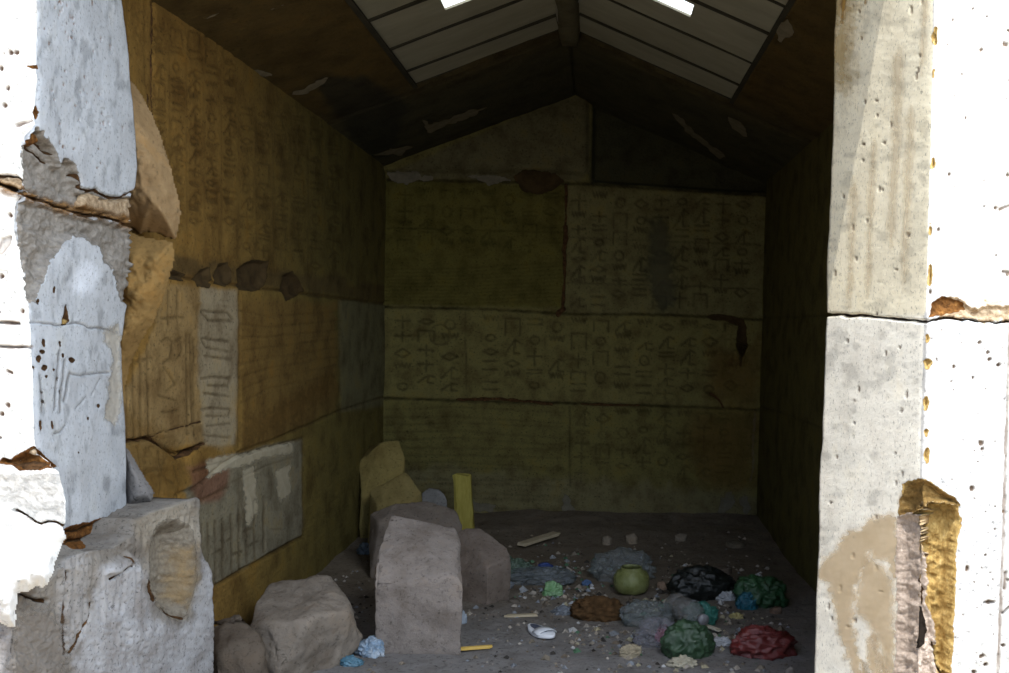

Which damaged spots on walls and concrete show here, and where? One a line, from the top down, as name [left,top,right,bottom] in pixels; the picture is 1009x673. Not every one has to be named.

crack [24,143,53,164]
crack [0,175,132,229]
spalling [0,106,134,305]
crack [833,314,1009,324]
spalling [929,296,1009,324]
spalling [32,350,60,391]
peeling [97,324,123,424]
spalling [893,478,962,673]